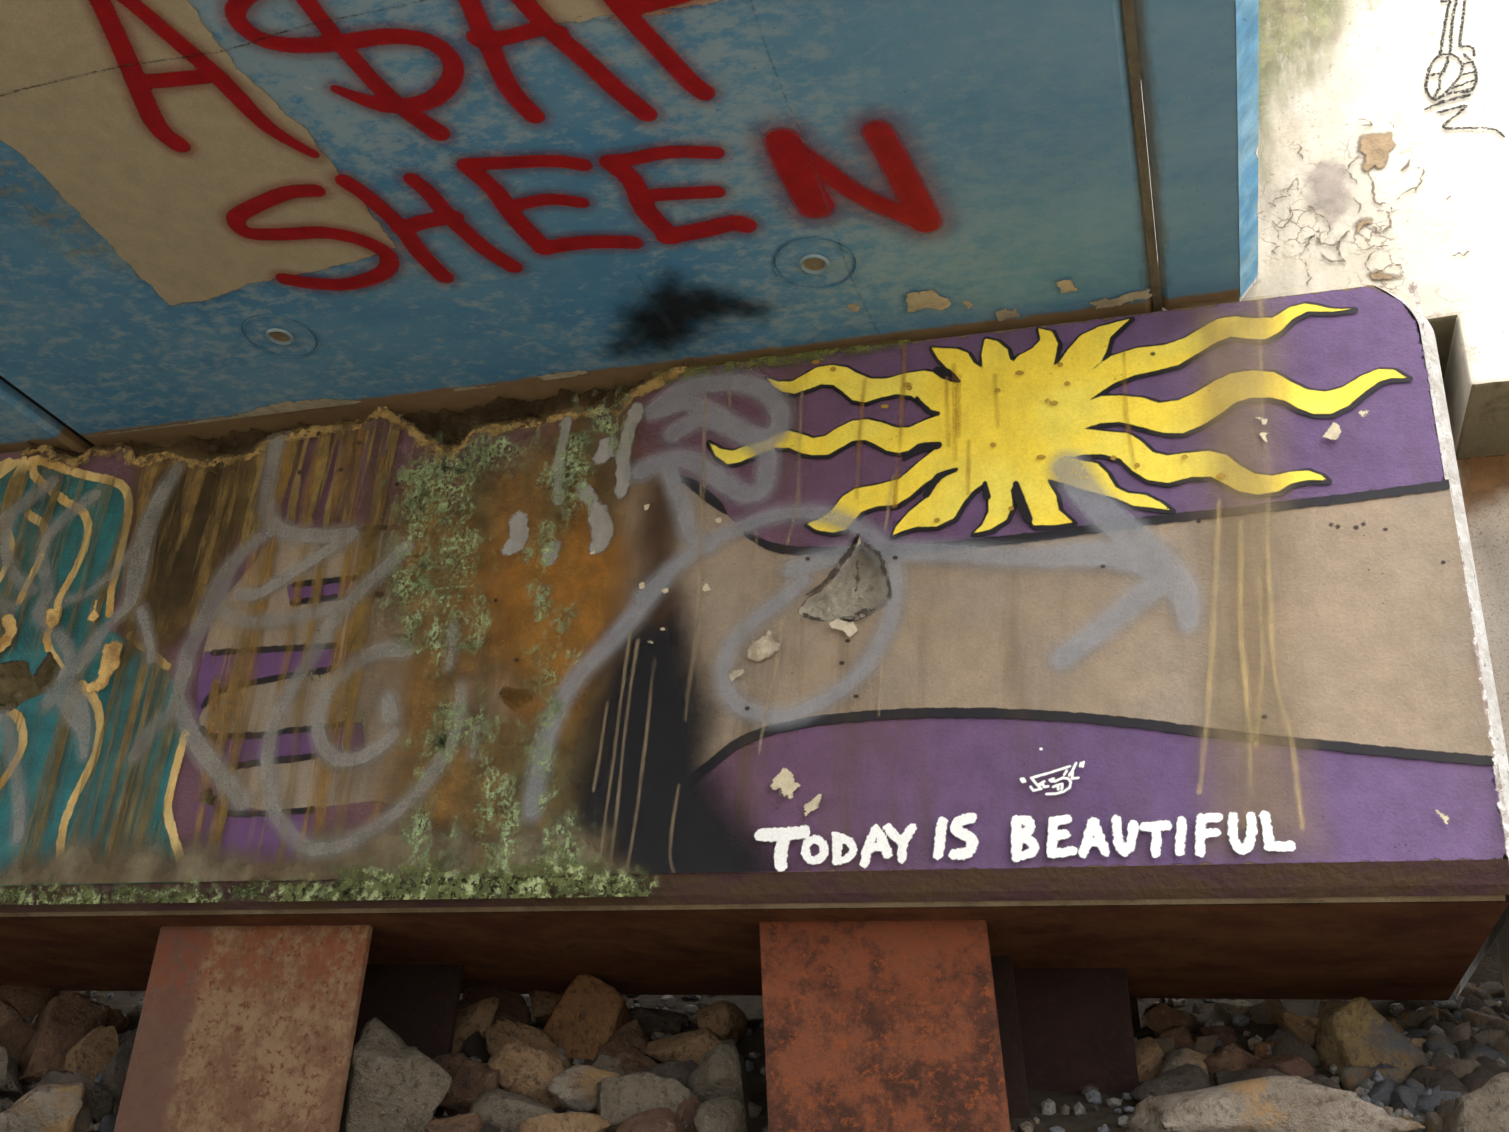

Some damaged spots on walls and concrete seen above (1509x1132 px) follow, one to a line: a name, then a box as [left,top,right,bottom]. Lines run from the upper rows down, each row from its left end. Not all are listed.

crack [1269,119,1451,285]
peeling [1056,280,1152,311]
spalling [20,361,687,470]
spalling [798,533,898,642]
corrosion [198,424,621,864]